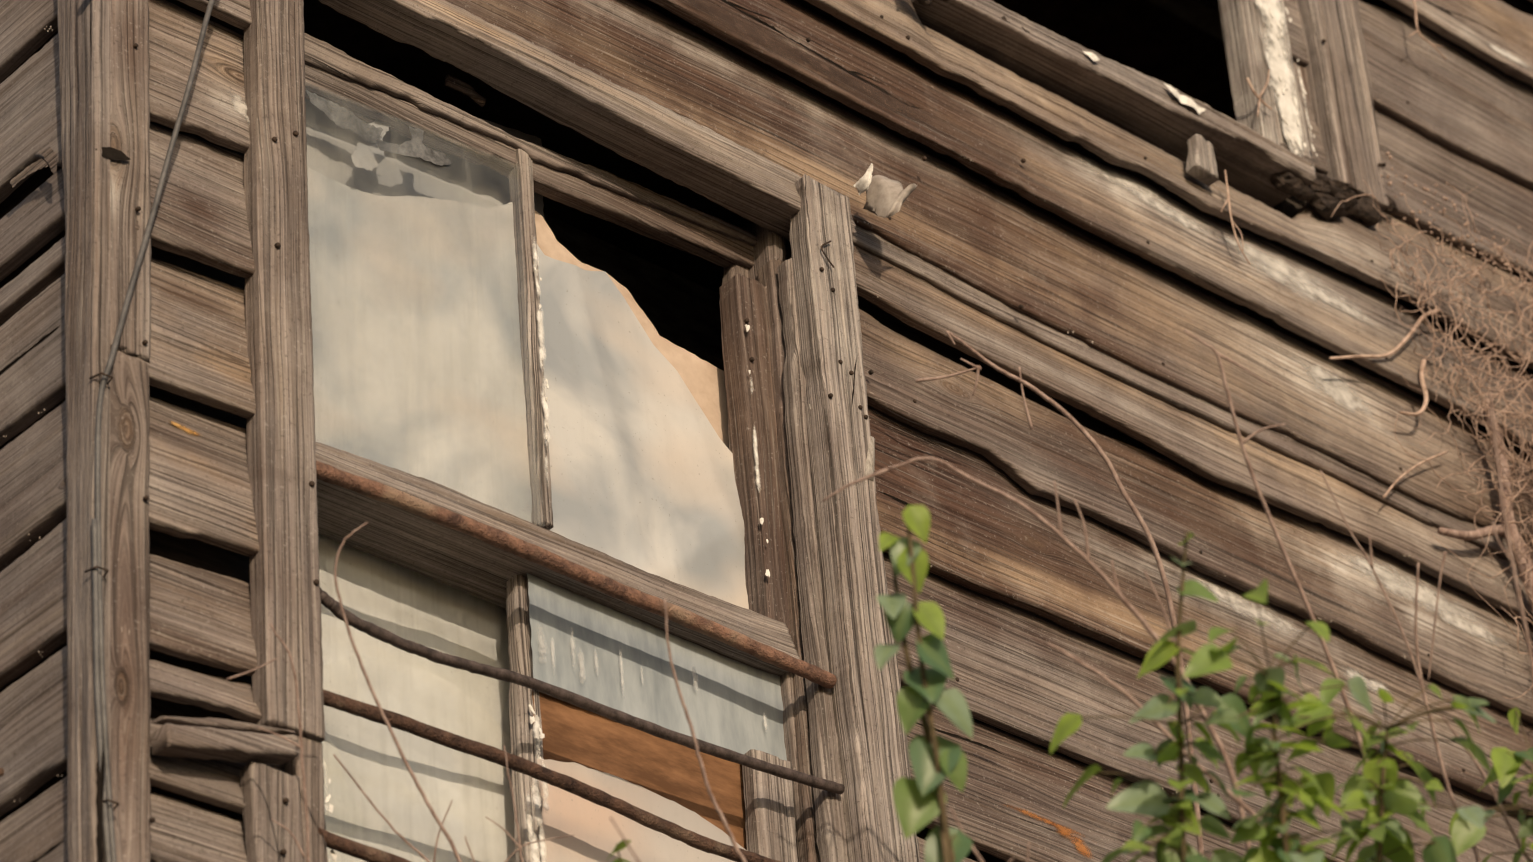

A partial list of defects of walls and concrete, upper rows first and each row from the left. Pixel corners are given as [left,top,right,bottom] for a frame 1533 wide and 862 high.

spalling [1255,0,1398,226]